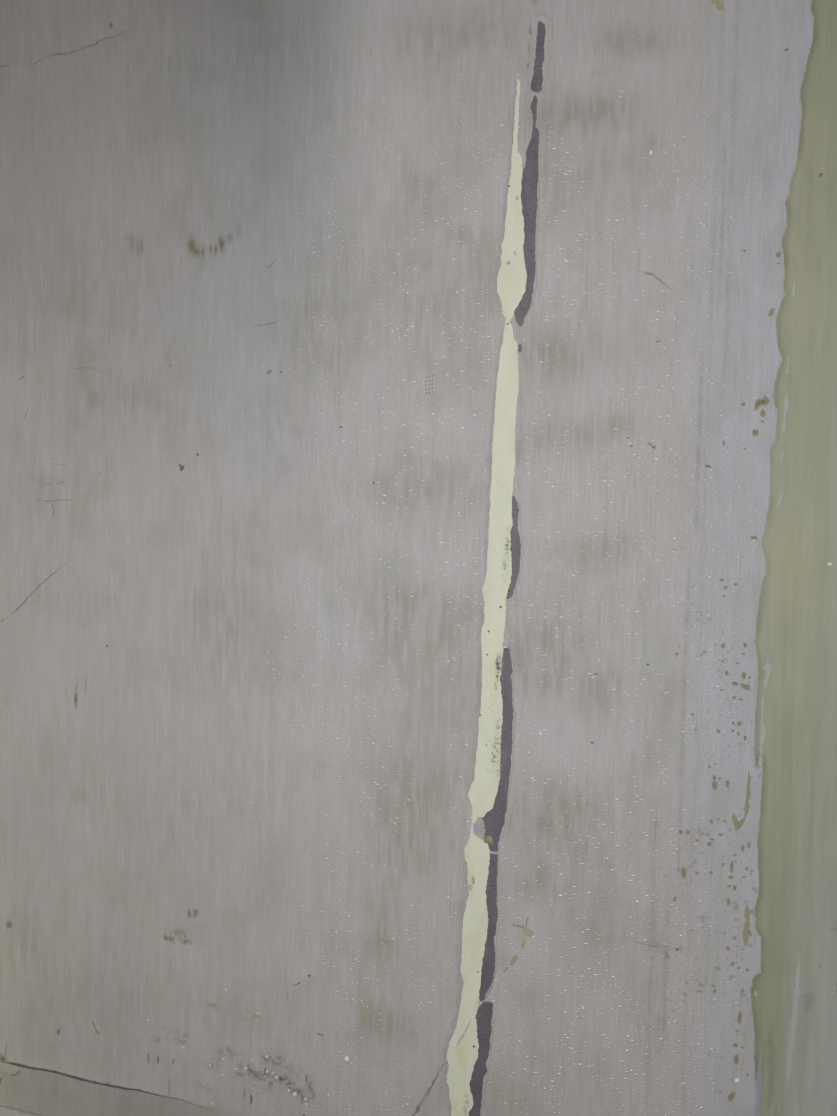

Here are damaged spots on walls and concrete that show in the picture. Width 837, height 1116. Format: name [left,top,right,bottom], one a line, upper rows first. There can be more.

crack [0,1042,194,1105]
peeling [443,21,545,1116]
peeling [679,0,837,1116]